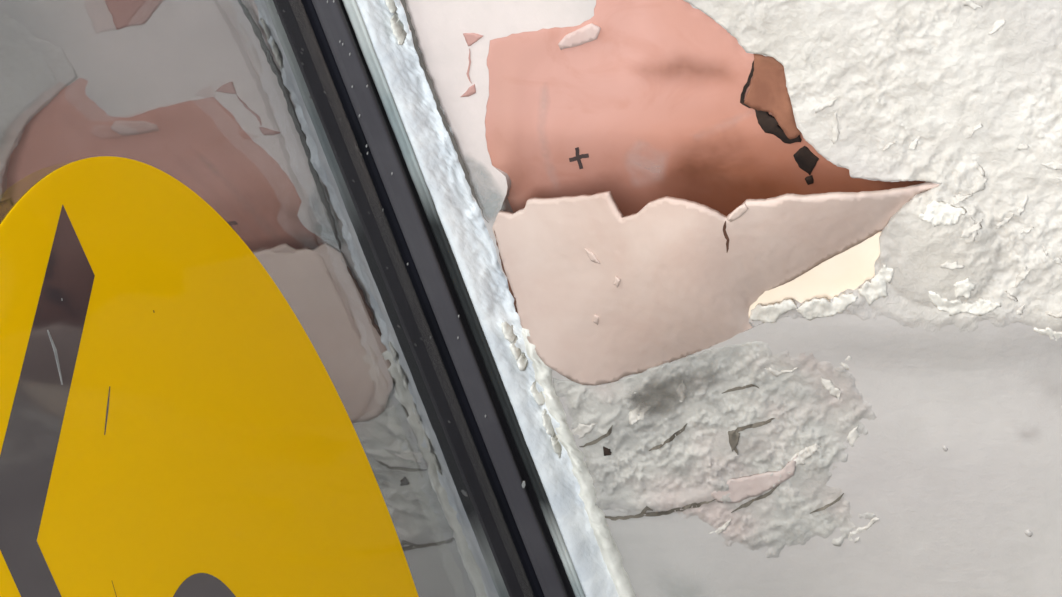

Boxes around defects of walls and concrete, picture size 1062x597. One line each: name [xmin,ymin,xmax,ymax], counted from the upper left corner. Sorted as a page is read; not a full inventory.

flaking render [463,0,1062,558]